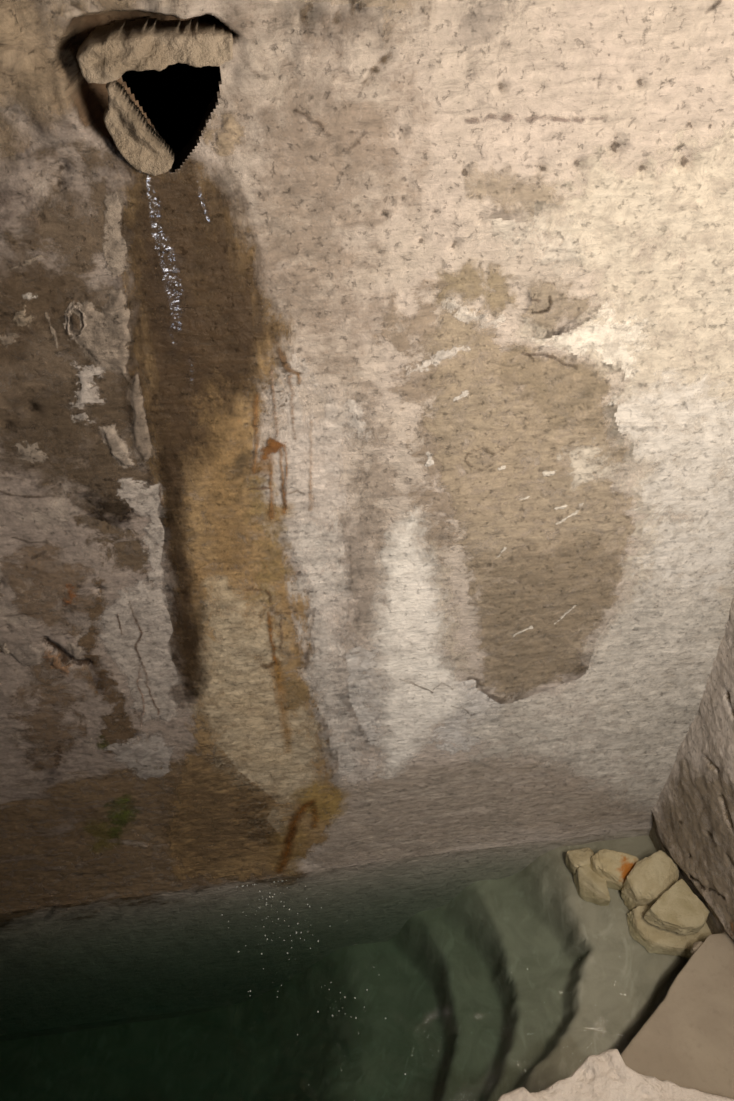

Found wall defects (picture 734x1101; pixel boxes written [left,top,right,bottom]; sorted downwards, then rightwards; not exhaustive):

corrosion [253,348,300,521]
water stain [0,52,734,927]
corrosion [277,783,342,873]
water stain [706,914,723,934]